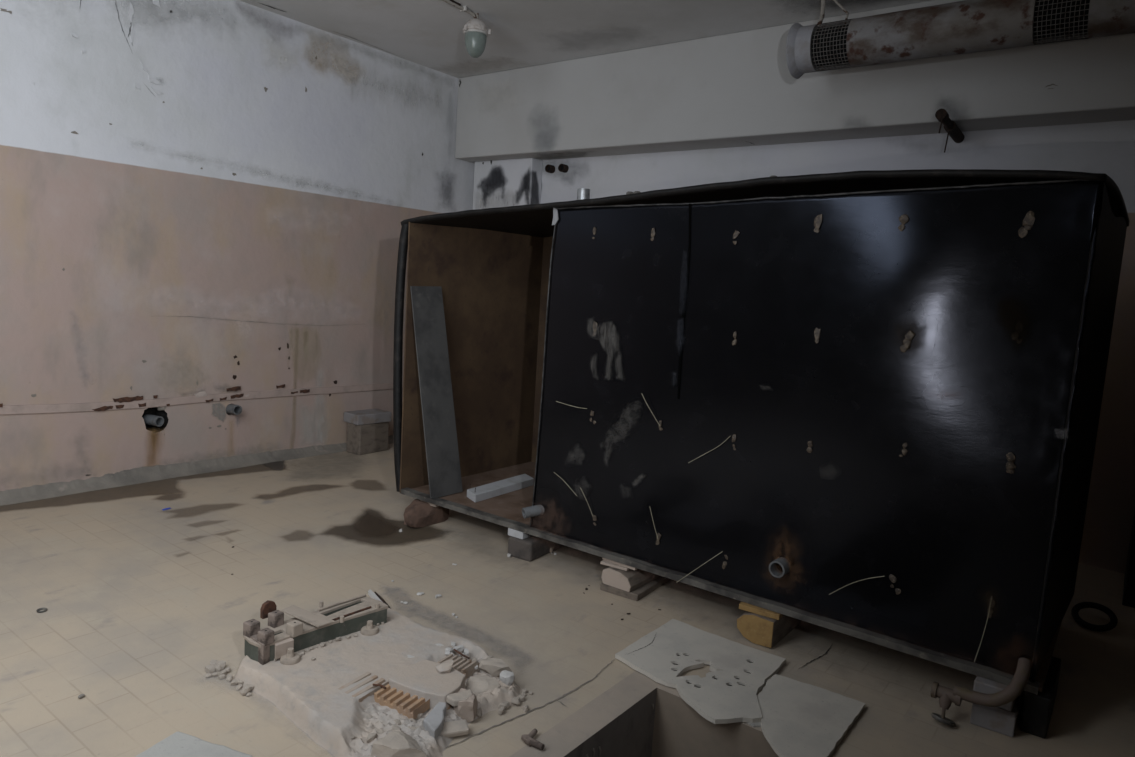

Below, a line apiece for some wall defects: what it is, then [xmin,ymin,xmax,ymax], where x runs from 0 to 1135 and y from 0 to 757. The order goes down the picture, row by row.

damp [479,167,505,204]
damp [516,170,530,204]
corrosion [92,395,170,411]